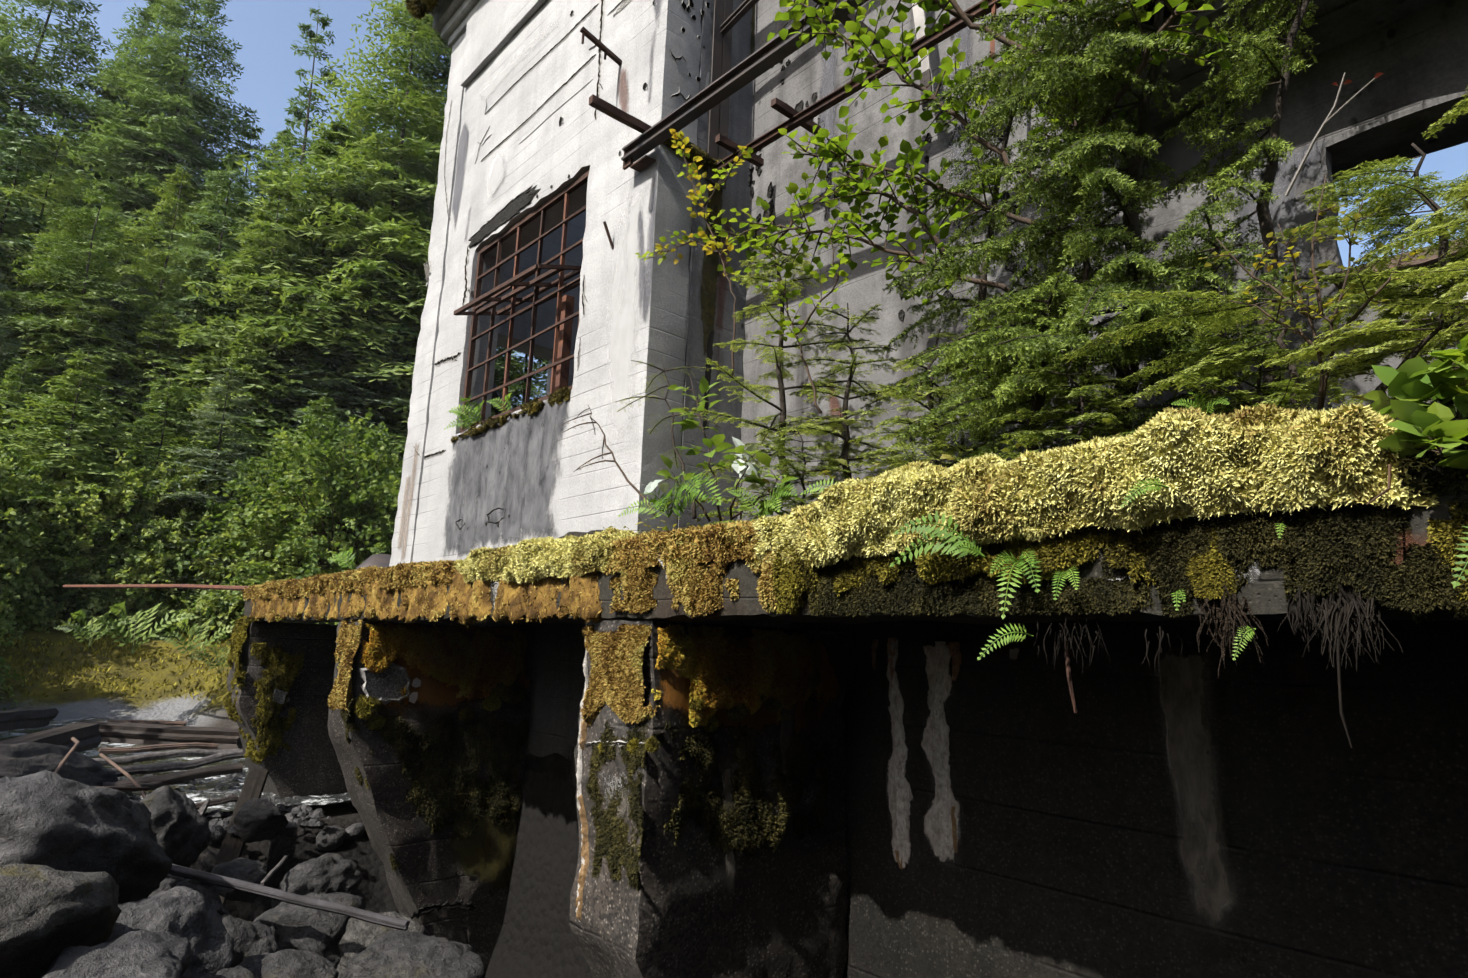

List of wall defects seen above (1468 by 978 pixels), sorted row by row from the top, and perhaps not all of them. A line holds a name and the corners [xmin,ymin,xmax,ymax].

corrosion [619,73,627,112]
water stain [444,398,568,555]
spalling [359,663,421,718]
water stain [871,637,962,869]